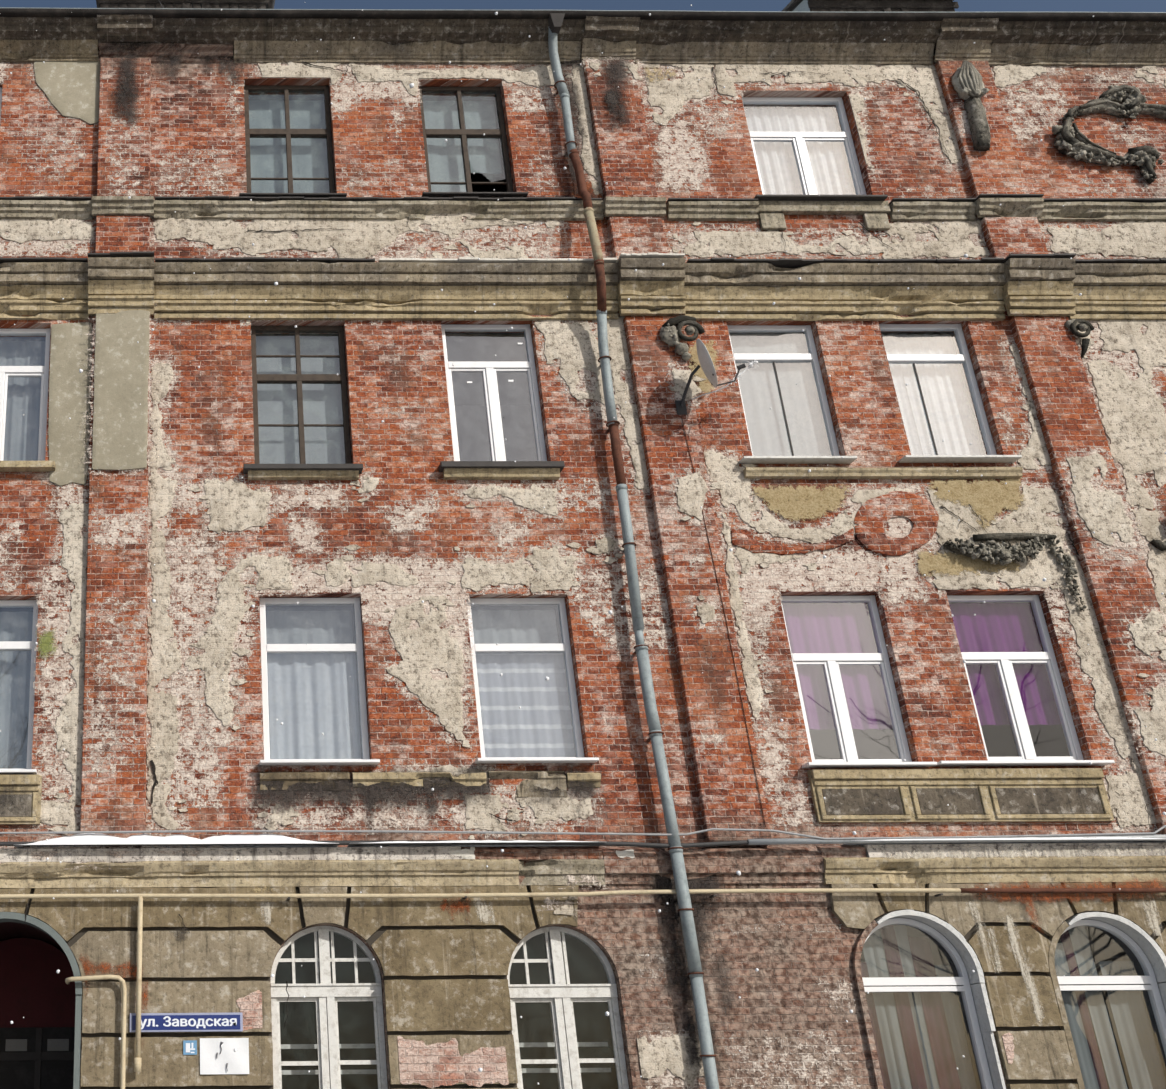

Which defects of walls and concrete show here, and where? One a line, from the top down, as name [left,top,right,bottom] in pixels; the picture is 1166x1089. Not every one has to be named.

leakage [106,42,151,122]
flaking render [990,64,1082,93]
flaking render [1130,65,1166,88]
flaking render [238,56,963,201]
flaking render [0,216,96,248]
flaking render [664,214,990,261]
flaking render [663,320,1166,832]
flaking render [146,355,624,859]
crack [150,760,158,803]
flaking render [397,1036,509,1088]